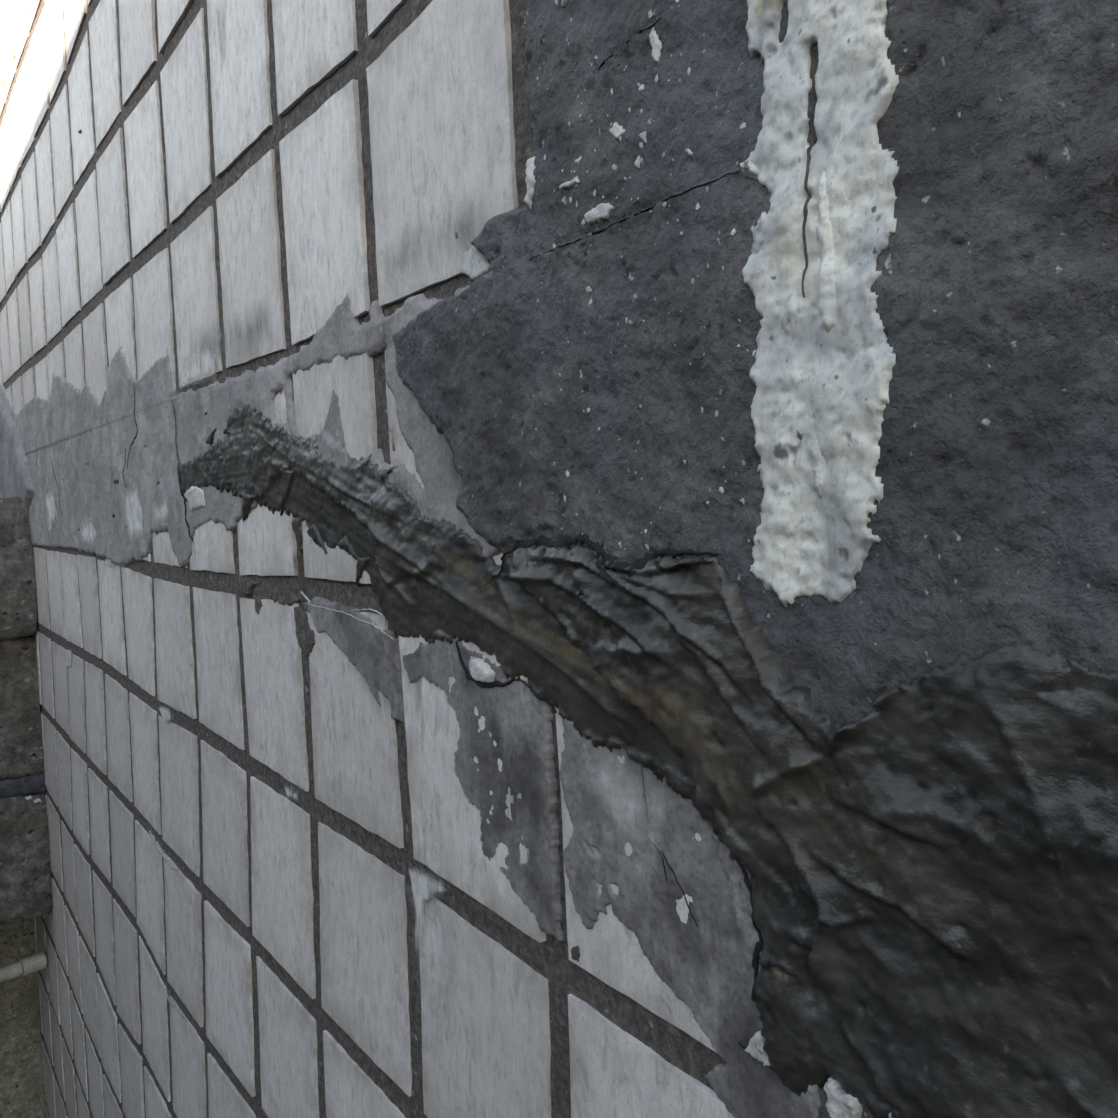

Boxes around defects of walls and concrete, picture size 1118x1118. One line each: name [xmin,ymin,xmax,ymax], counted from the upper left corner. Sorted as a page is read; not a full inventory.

peeling [637,0,682,91]
peeling [607,115,626,141]
peeling [523,154,546,209]
peeling [554,149,596,203]
peeling [622,131,647,201]
spalling [455,214,502,264]
peeling [581,190,617,247]
crack [530,171,739,260]
peeling [736,0,899,607]
spalling [184,486,206,511]
spalling [469,656,495,683]
damp [409,871,448,1008]